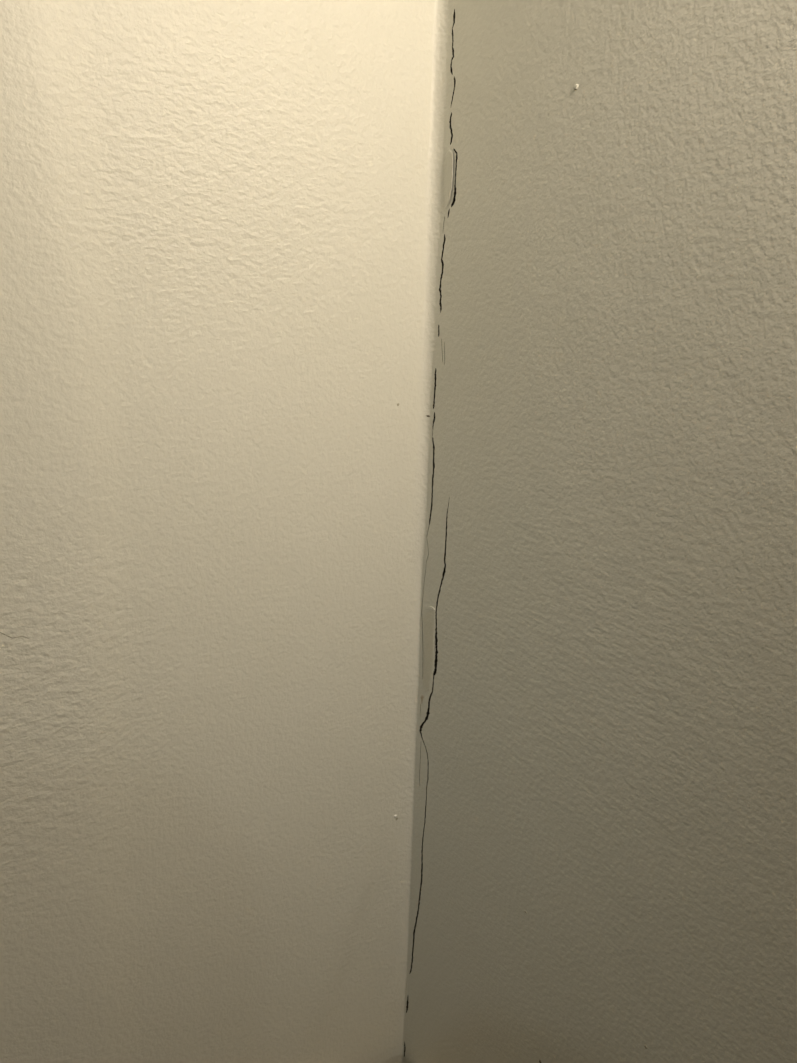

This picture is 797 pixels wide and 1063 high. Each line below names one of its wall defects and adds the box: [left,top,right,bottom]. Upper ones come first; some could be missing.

crack [406,9,458,1013]